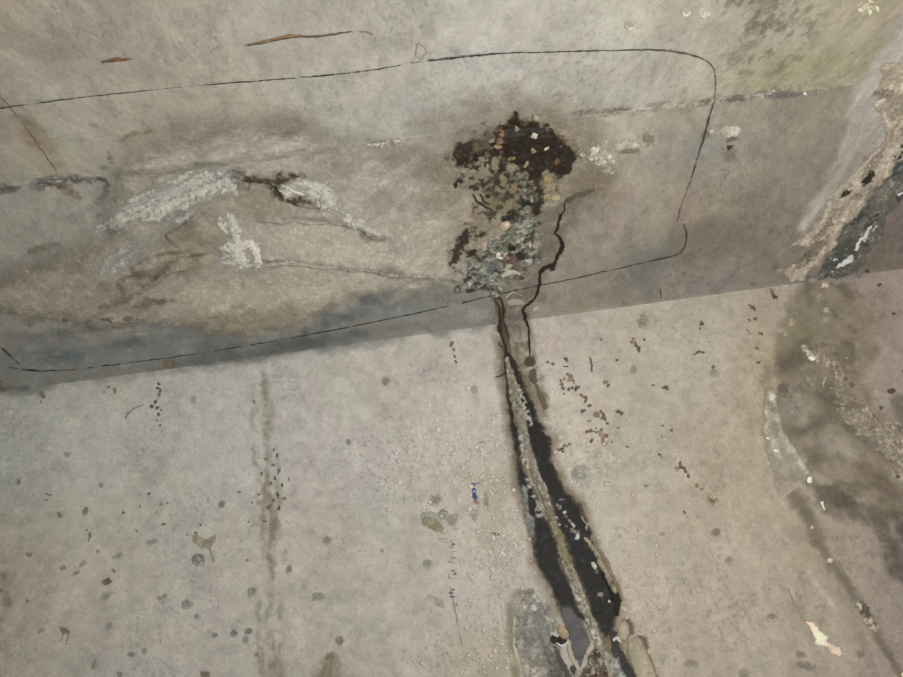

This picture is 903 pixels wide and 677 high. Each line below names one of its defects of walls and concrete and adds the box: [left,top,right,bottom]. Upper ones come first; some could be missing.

corrosion [246,31,373,46]
crack [2,98,57,172]
water stain [92,167,384,288]
spalling [449,171,542,300]
water stain [502,140,616,330]
peeling [831,225,878,273]
water stain [0,294,493,396]
crack [478,188,636,677]
water stain [768,271,903,609]
water stain [787,585,842,656]